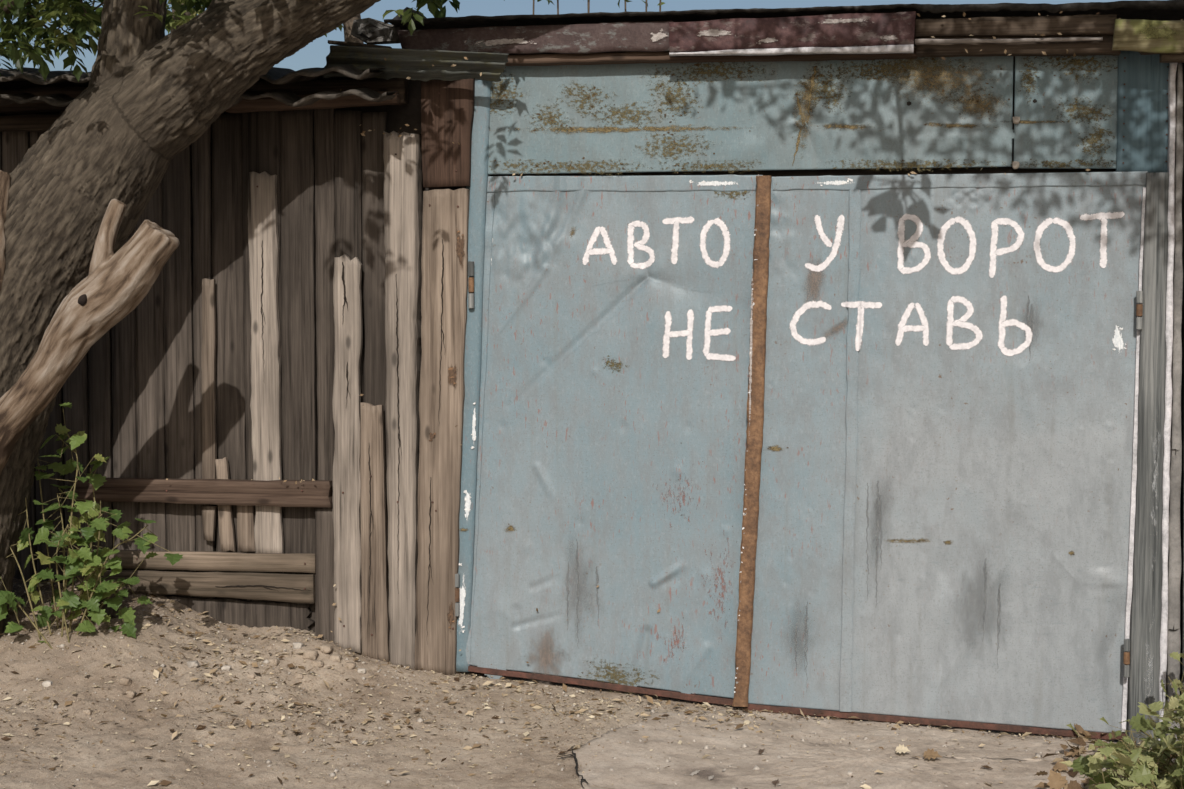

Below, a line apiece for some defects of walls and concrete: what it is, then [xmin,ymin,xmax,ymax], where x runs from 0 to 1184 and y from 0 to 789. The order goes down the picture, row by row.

peeling [651,28,668,42]
peeling [698,29,736,37]
peeling [464,38,536,47]
rust [489,62,778,175]
rust [793,56,1118,168]
rust [833,159,1005,172]
rust [580,661,658,693]